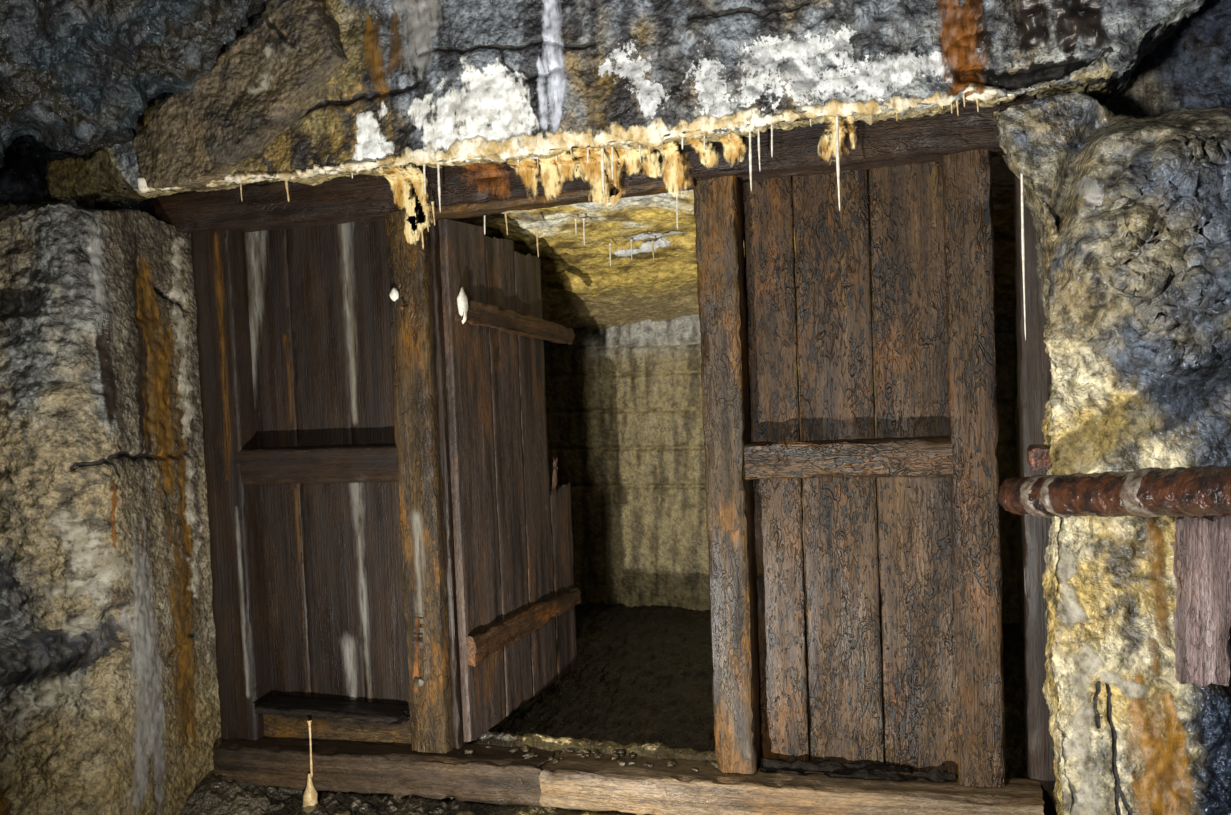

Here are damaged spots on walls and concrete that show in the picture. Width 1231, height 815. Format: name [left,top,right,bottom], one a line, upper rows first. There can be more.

water stain [353,100,394,165]
water stain [395,0,441,76]
water stain [408,0,565,161]
water stain [598,36,670,119]
water stain [682,22,954,134]
corrosion [938,0,987,105]
crack [69,451,188,479]
corrosion [136,260,197,756]
water stain [123,521,165,811]
corrosion [1129,519,1192,815]
crack [1092,681,1133,815]